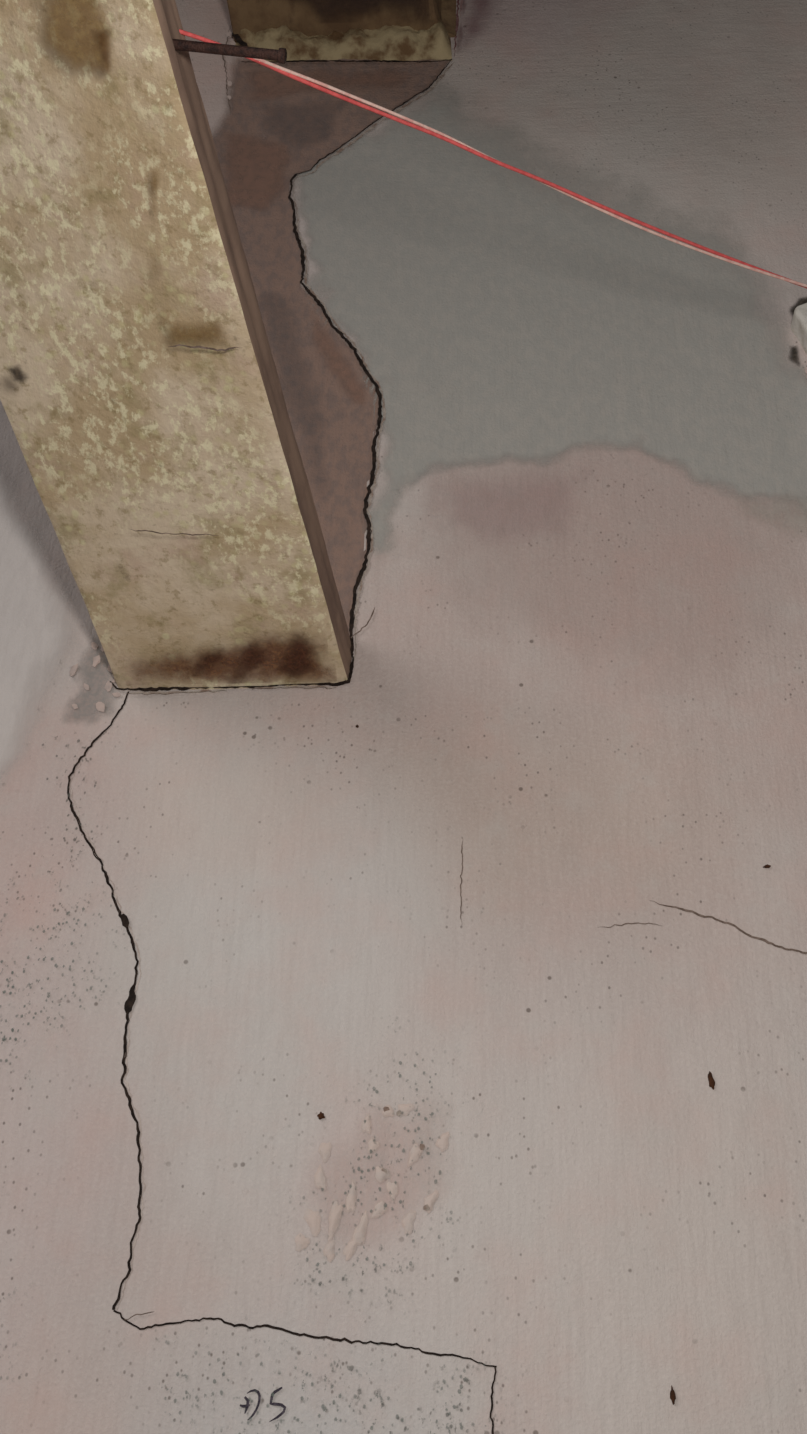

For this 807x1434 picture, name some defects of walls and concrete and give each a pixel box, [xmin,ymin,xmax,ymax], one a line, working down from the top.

spalling [213,59,449,636]
crack [67,691,497,1434]
crack [607,900,807,954]